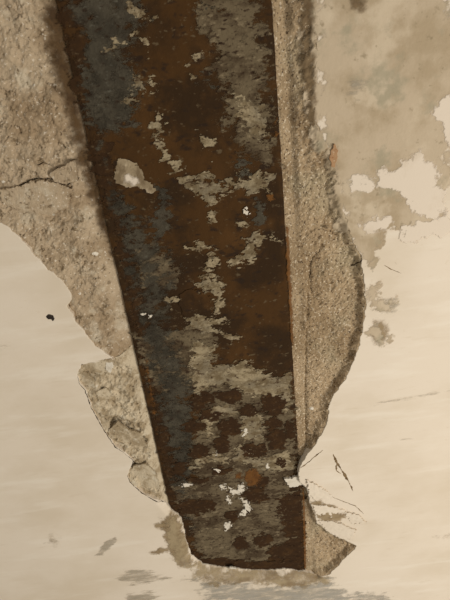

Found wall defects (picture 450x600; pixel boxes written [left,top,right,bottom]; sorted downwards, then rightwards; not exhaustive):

peeling [194,0,278,166]
rust [299,0,315,125]
peeling [114,158,173,239]
peeling [176,158,276,208]
rust [44,0,308,570]
peeling [194,249,227,315]
spalling [167,480,367,587]
leakage [312,501,346,522]
crack [302,450,364,514]
leakage [126,592,154,600]
leakage [120,570,168,586]
leakage [204,577,385,600]